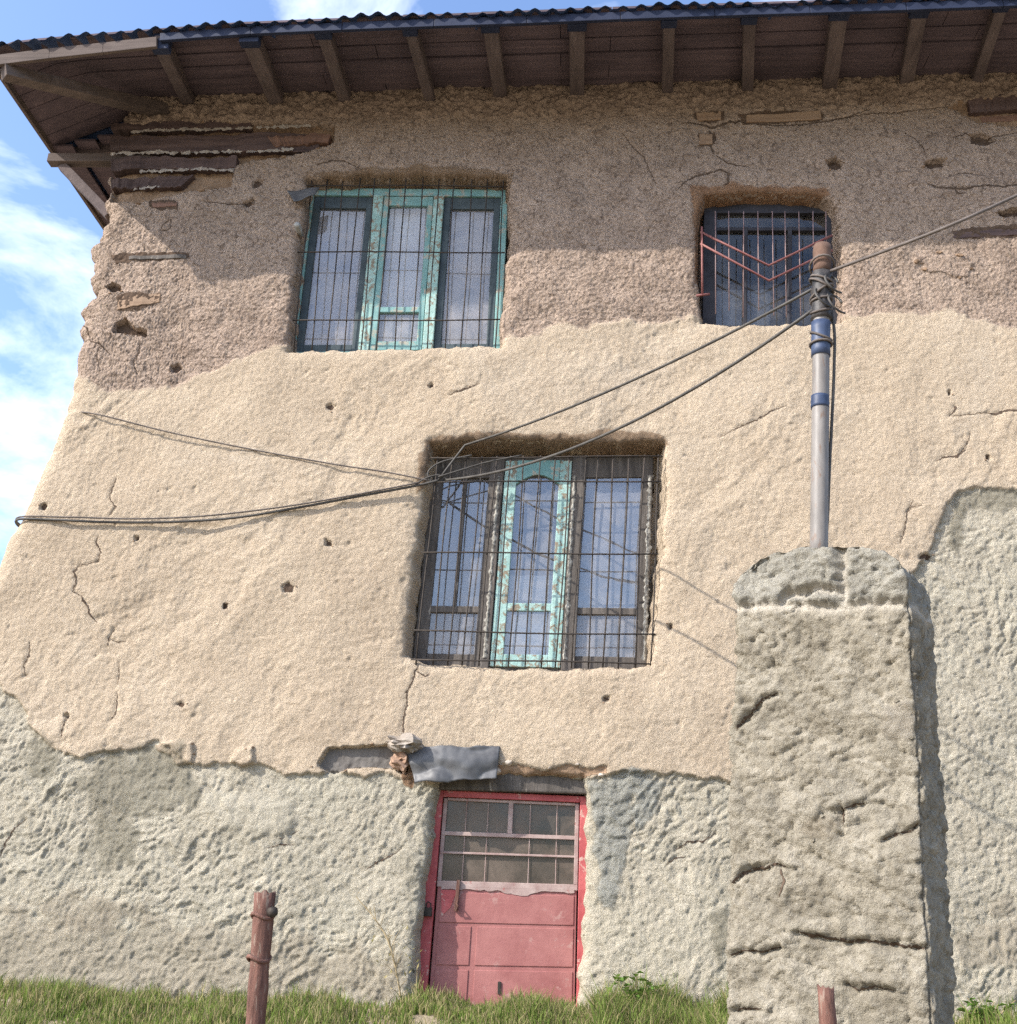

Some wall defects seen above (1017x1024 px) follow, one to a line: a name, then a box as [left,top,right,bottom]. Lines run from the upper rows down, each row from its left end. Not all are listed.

crack [622,107,946,190]
spalling [110,121,334,210]
crack [72,537,125,720]
crack [402,666,429,732]
crack [736,693,777,731]
peeling [156,741,196,766]
peeling [230,746,254,767]
spalling [311,743,395,774]
crack [882,823,918,840]
crack [732,863,786,895]
crack [731,931,924,956]
crack [848,983,894,991]